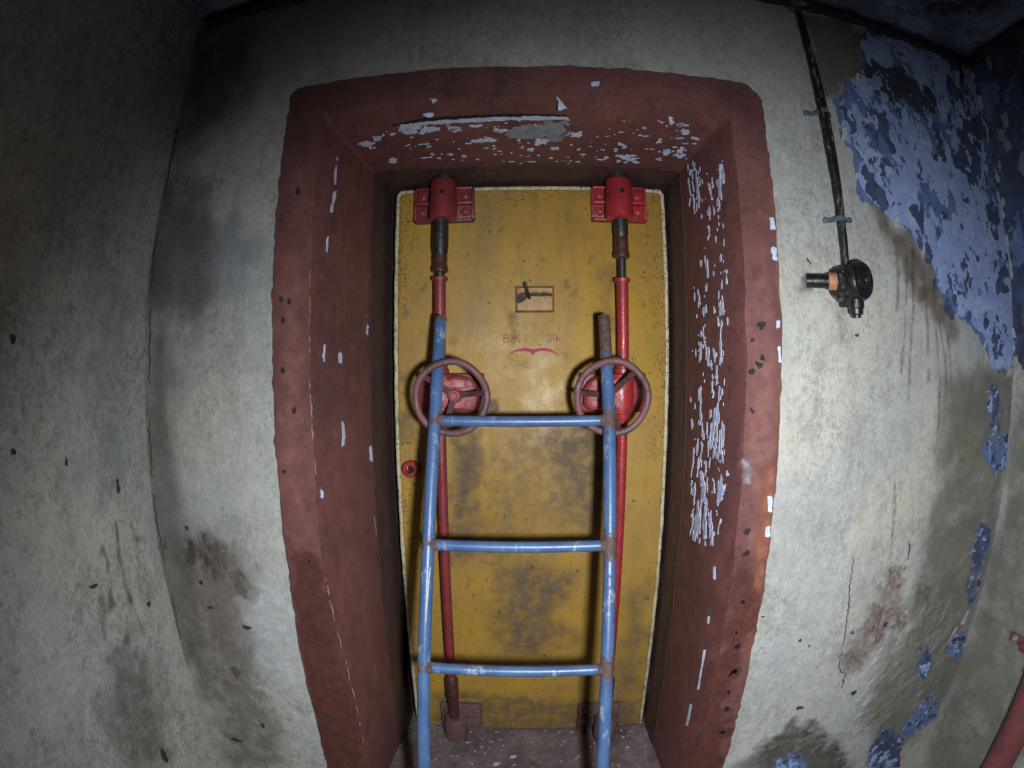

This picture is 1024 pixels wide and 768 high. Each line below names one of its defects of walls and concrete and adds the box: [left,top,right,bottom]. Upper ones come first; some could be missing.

peeling [358,97,729,546]
damp [878,209,953,329]
peeling [832,28,1024,476]
crack [838,558,854,689]
peeling [867,691,939,768]
peeling [917,645,933,680]
damp [871,374,1024,768]
peeling [946,522,991,661]